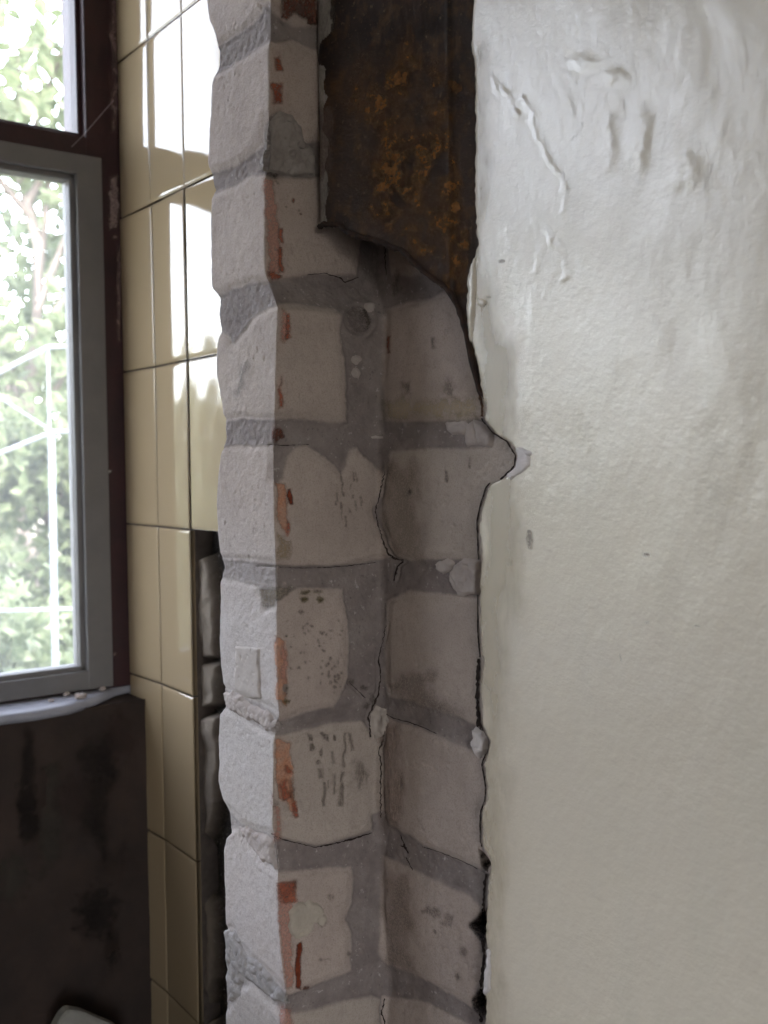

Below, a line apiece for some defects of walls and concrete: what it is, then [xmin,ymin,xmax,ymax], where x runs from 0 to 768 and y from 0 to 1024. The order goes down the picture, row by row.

peeling [307,0,333,223]
rust [351,27,469,294]
peeling [198,531,291,1024]
flaking render [370,242,532,1024]